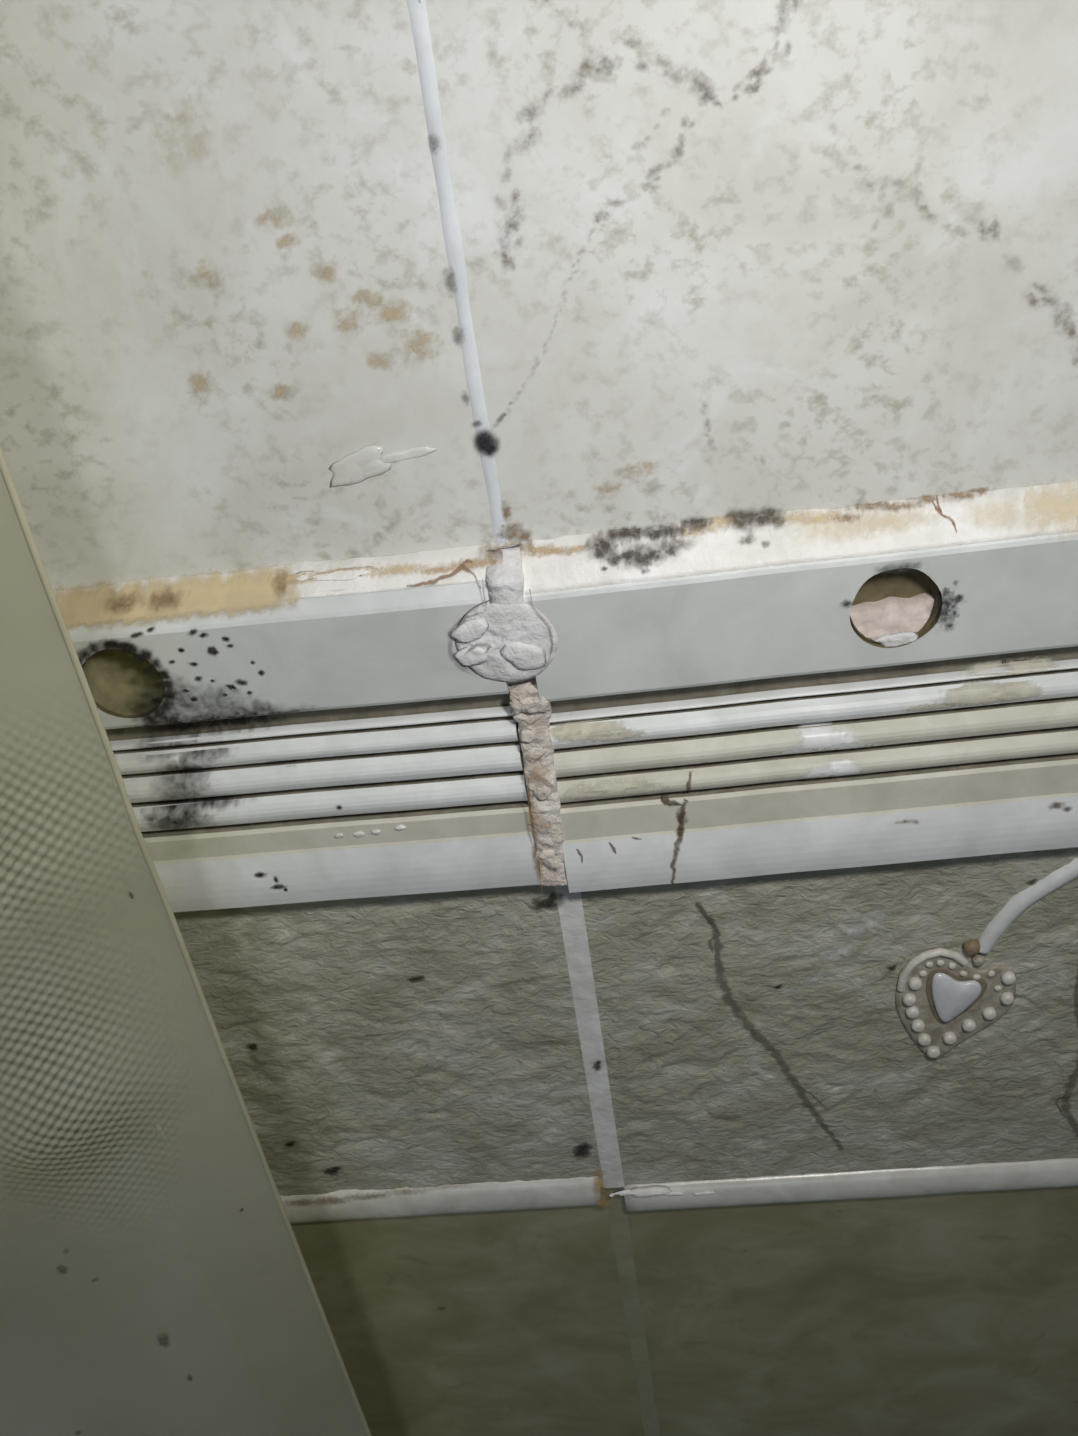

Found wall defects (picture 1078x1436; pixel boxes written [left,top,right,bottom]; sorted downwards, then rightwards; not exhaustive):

leakage [594,509,833,573]
leakage [56,565,411,829]
crack [661,762,844,1150]
crack [1070,976,1078,1018]
crack [1055,1062,1078,1137]